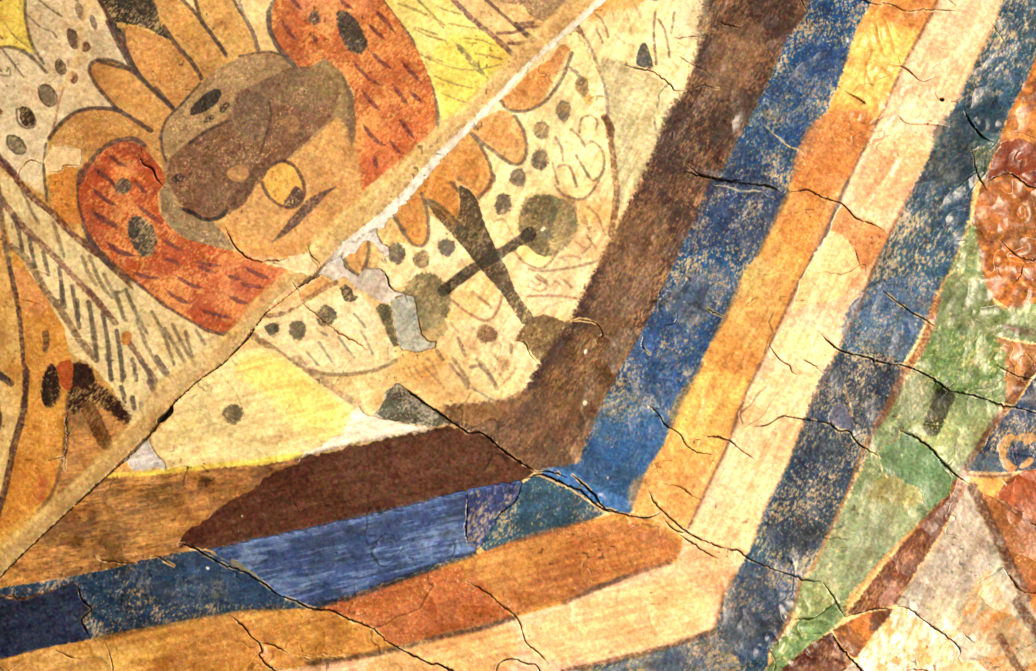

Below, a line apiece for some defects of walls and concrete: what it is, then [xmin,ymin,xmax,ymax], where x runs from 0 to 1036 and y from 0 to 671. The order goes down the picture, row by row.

crack [861,0,957,13]
crack [624,20,745,93]
crack [765,125,807,157]
crack [893,58,1036,191]
crack [682,163,884,231]
crack [997,236,1036,286]
crack [882,289,937,328]
crack [647,332,1036,460]
peeling [179,382,534,646]
crack [401,384,983,671]
crack [54,582,115,671]
crack [96,542,458,671]